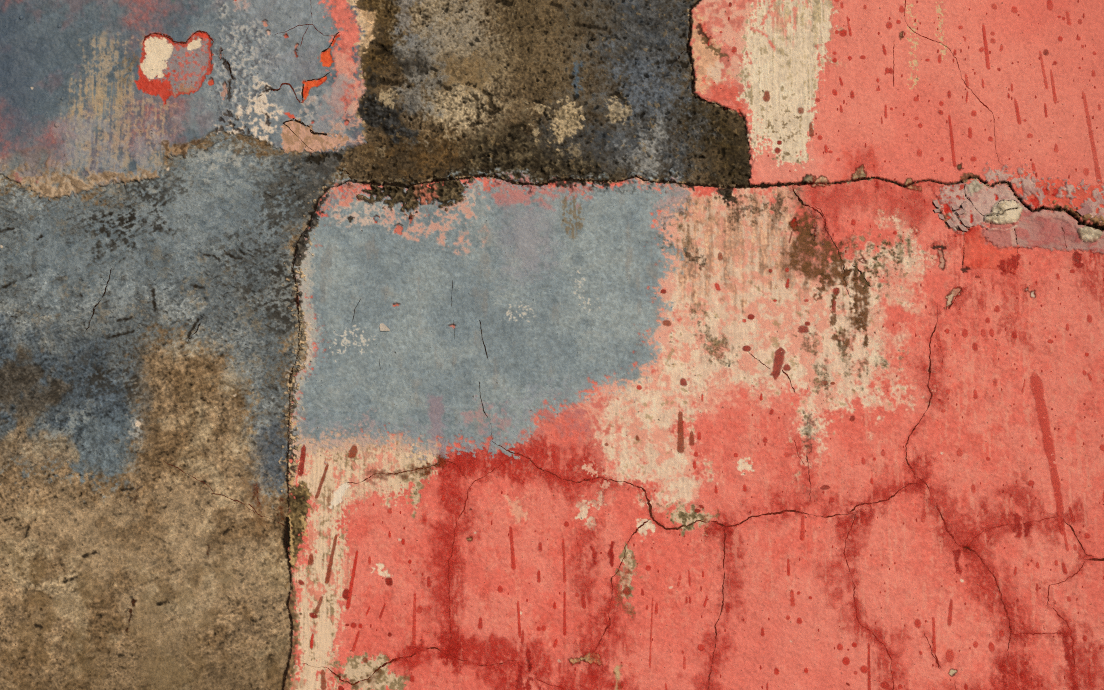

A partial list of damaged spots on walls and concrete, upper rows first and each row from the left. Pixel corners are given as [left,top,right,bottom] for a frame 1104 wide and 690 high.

peeling [136,32,228,104]
crack [904,0,999,161]
spalling [281,0,950,618]
peeling [945,287,963,309]
peeling [904,163,1104,275]
crack [163,171,1104,690]